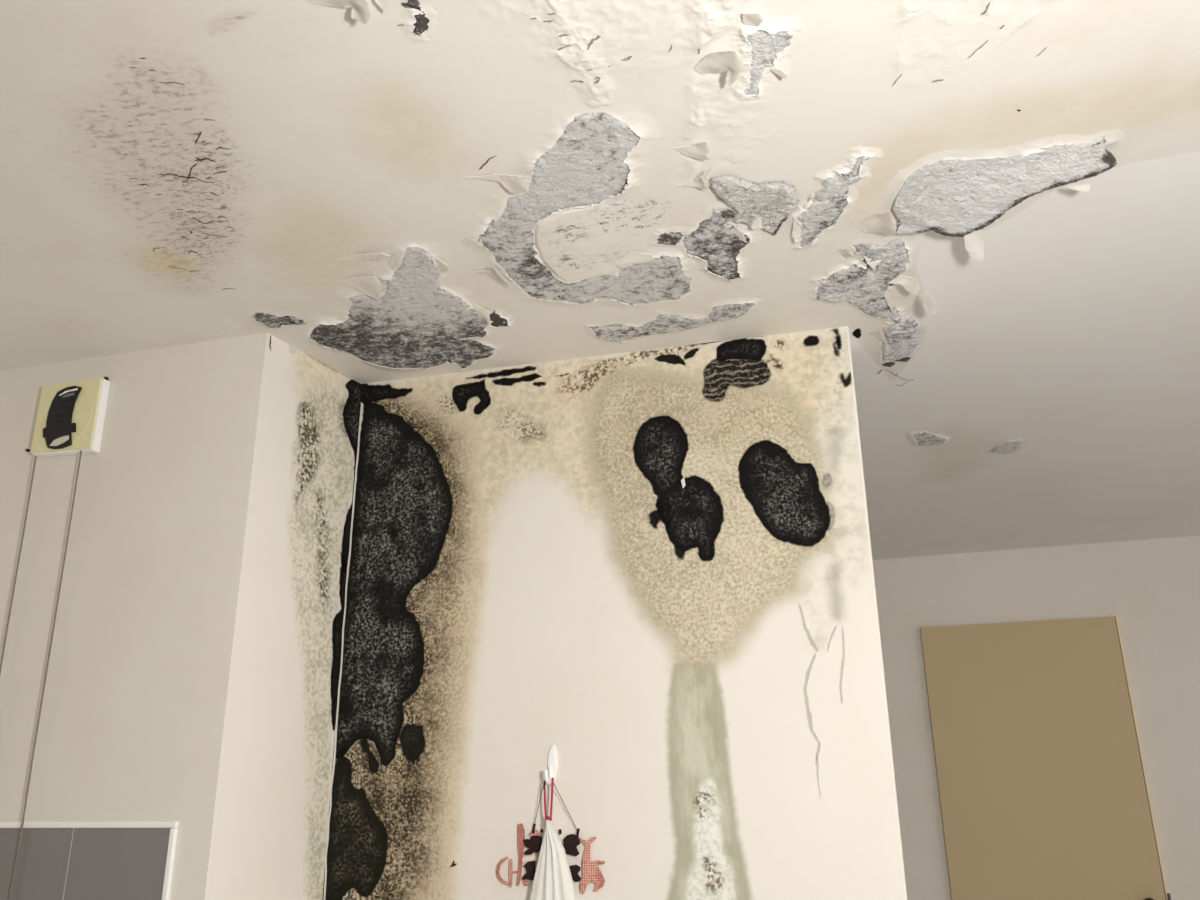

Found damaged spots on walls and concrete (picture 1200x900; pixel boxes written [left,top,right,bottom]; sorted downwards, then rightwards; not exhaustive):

peeling [694,13,809,103]
leakage [630,146,724,248]
peeling [244,100,1130,374]
leakage [452,380,491,415]
leakage [471,366,536,379]
leakage [493,373,542,386]
leakage [655,353,685,366]
leakage [804,336,819,346]
leakage [633,416,724,561]
mould [738,440,835,547]
leakage [271,373,355,900]
leakage [343,747,362,763]